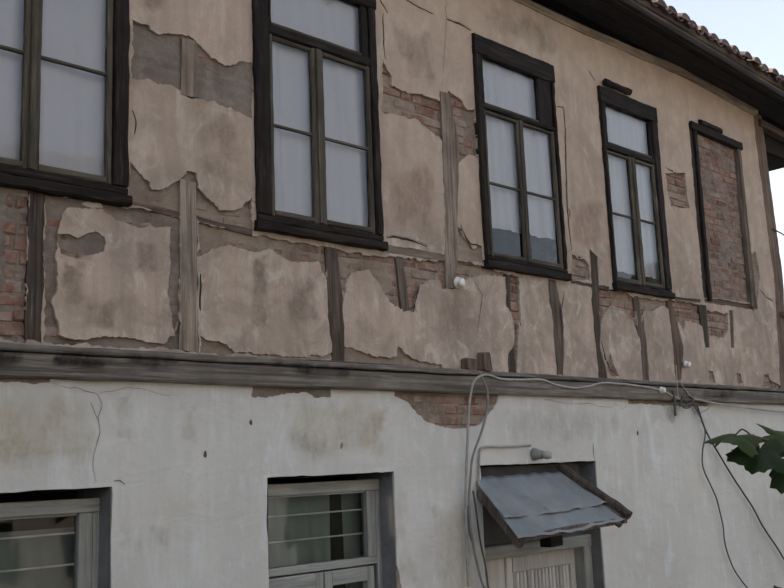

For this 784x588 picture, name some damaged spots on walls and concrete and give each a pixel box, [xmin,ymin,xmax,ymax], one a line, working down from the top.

flaking render [131,23,253,117]
crack [380,0,389,59]
flaking render [381,66,440,137]
crack [407,0,471,90]
flaking render [448,92,476,161]
flaking render [0,187,28,343]
flaking render [43,164,325,352]
flaking render [336,249,444,312]
crack [54,383,169,484]
flaking render [251,387,331,398]
flaking render [344,347,441,368]
flaking render [394,392,497,429]